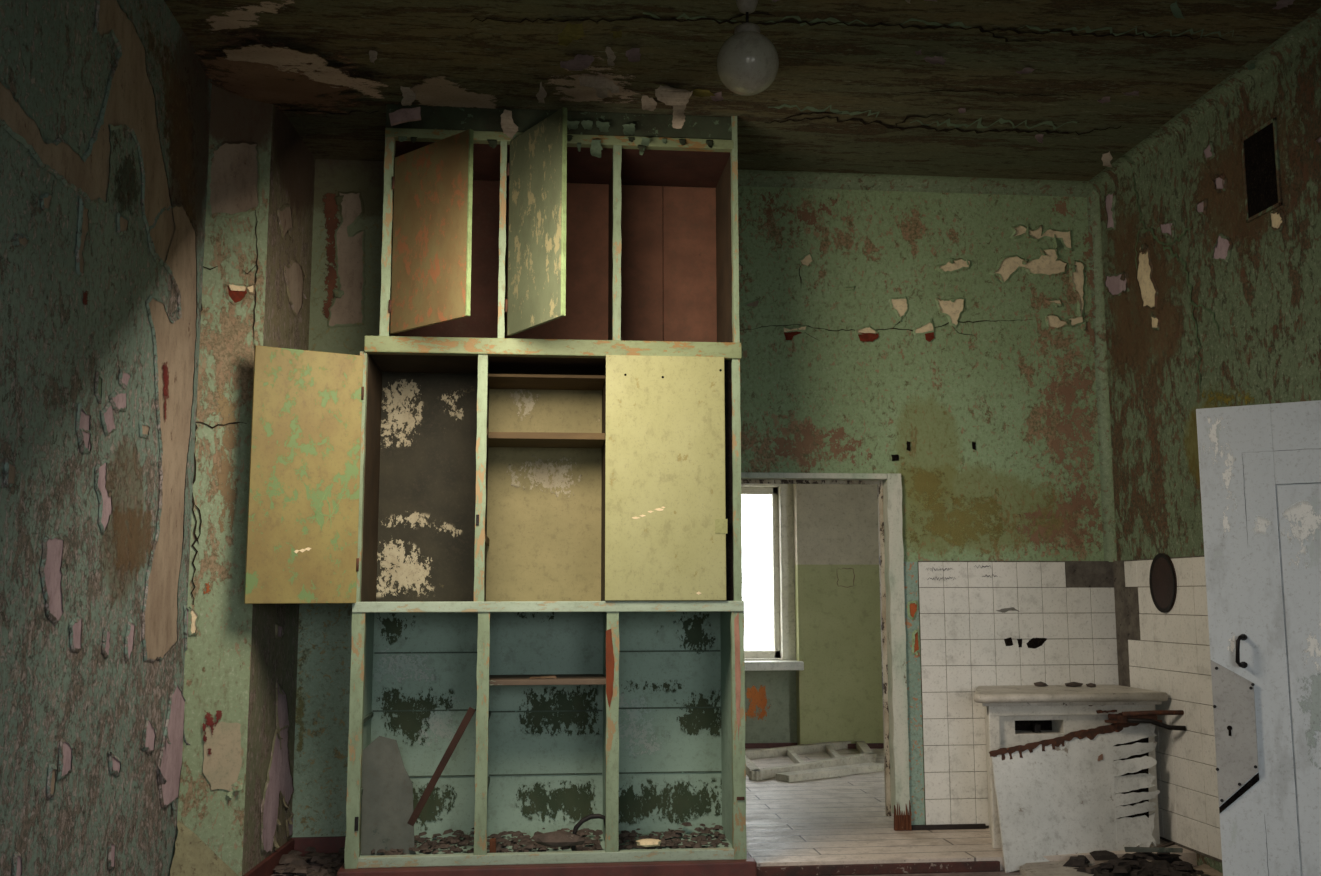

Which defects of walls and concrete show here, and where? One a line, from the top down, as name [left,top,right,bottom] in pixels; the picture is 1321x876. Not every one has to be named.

flaking render [223,44,518,148]
flaking render [536,47,693,146]
crack [765,90,1121,135]
leakage [1183,101,1307,265]
flaking render [327,191,366,328]
crack [741,319,1031,341]
flaking render [989,191,1175,373]
leakage [1103,177,1195,389]
flaking render [102,203,200,663]
leakage [901,457,1004,553]
flaking render [141,681,244,811]
flaking render [261,621,309,855]